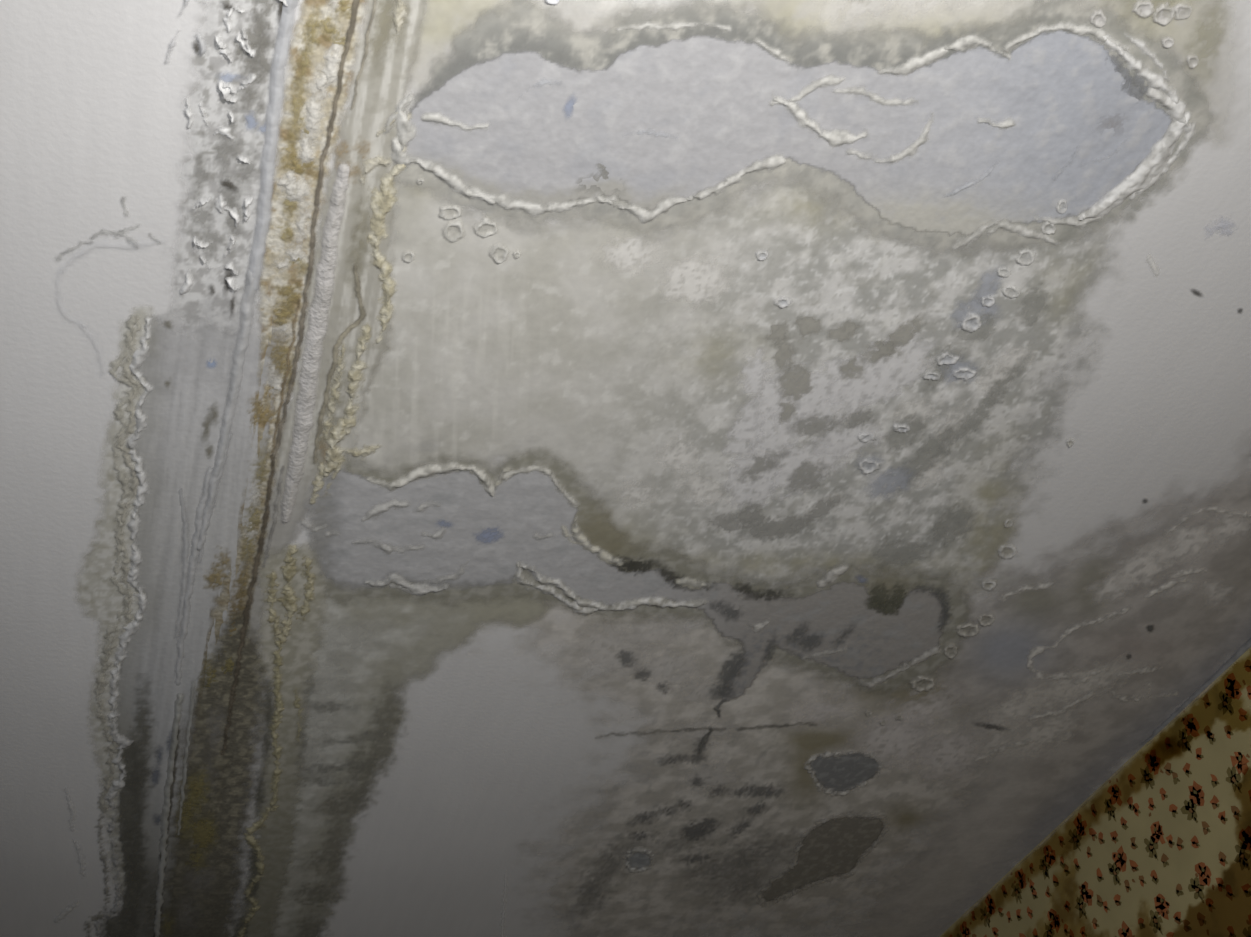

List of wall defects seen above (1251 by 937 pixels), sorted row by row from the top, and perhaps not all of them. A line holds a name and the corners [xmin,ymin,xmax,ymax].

peeling [385,0,1212,252]
leakage [527,0,1230,135]
peeling [78,0,298,937]
corrosion [195,0,365,728]
peeling [302,453,969,701]
leakage [161,0,1117,937]
leakage [844,476,1251,937]